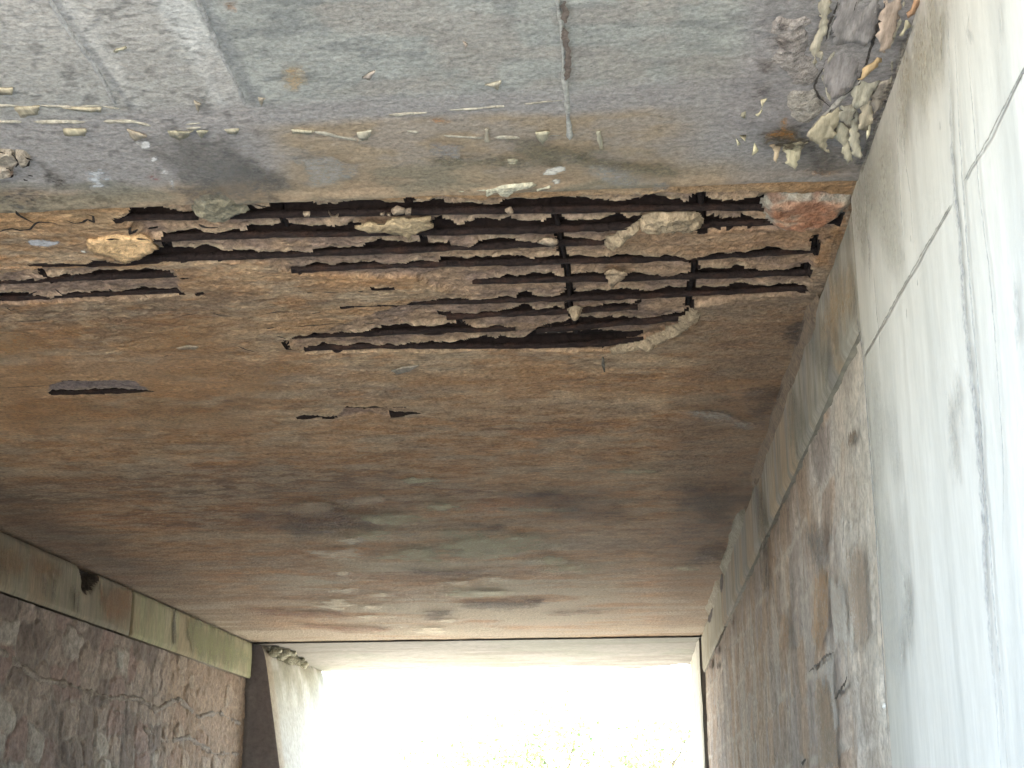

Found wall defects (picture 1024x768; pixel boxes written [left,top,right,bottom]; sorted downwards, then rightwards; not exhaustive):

peeling [736,0,920,169]
peeling [0,87,40,118]
peeling [63,128,87,136]
peeling [357,129,372,140]
peeling [535,131,550,145]
spalling [0,148,31,179]
spalling [0,189,852,375]
spalling [45,379,154,395]
spalling [294,405,421,420]
leakage [287,502,555,585]
efflorescence [318,588,352,610]
leakage [417,610,456,634]